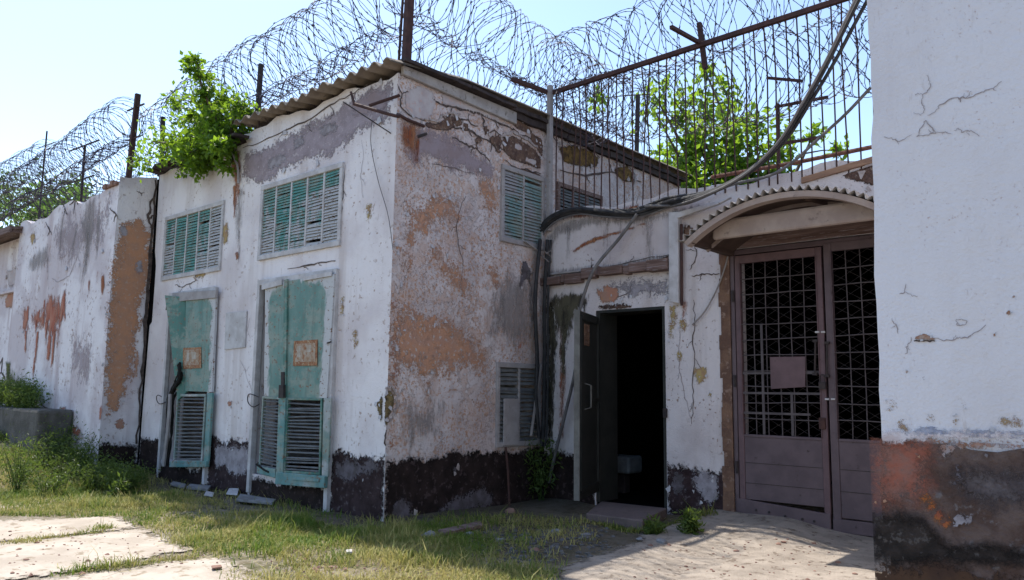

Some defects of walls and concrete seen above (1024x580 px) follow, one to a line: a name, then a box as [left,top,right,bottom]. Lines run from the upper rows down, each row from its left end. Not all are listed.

peeling [242,79,393,186]
peeling [406,112,543,218]
spalling [557,142,601,171]
spalling [613,162,637,184]
crack [886,75,1002,145]
peeling [5,266,70,371]
peeling [53,192,154,430]
peeling [335,300,490,482]
leakage [546,292,589,449]
peeling [596,273,687,361]
crack [938,319,986,341]
leakage [872,512,1024,580]